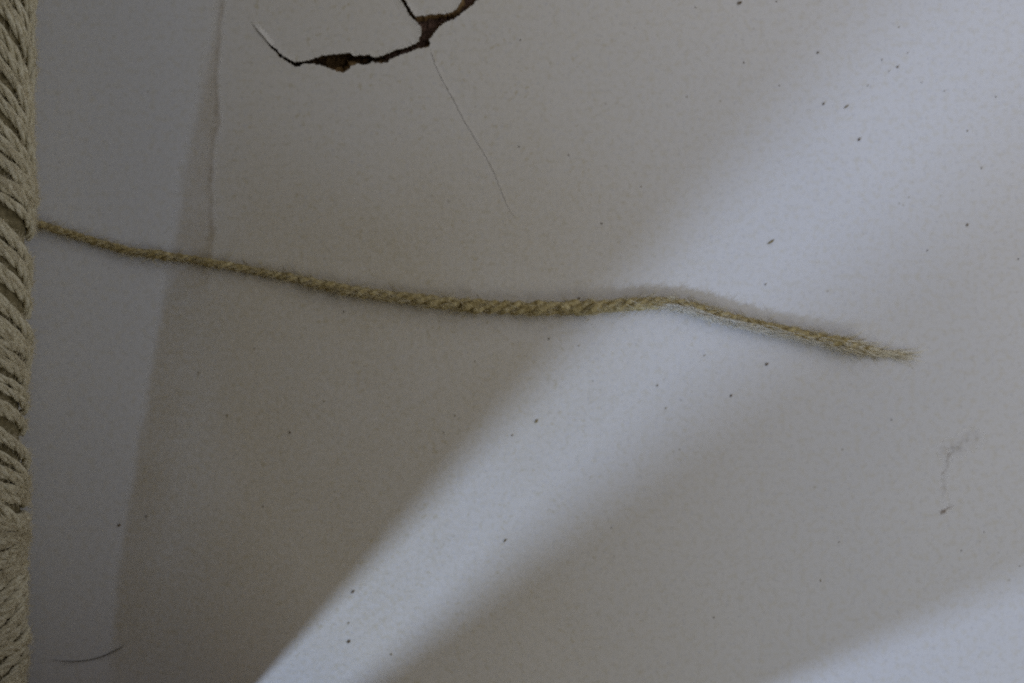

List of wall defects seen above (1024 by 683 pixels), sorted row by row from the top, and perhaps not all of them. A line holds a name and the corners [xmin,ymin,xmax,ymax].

crack [246,0,517,217]